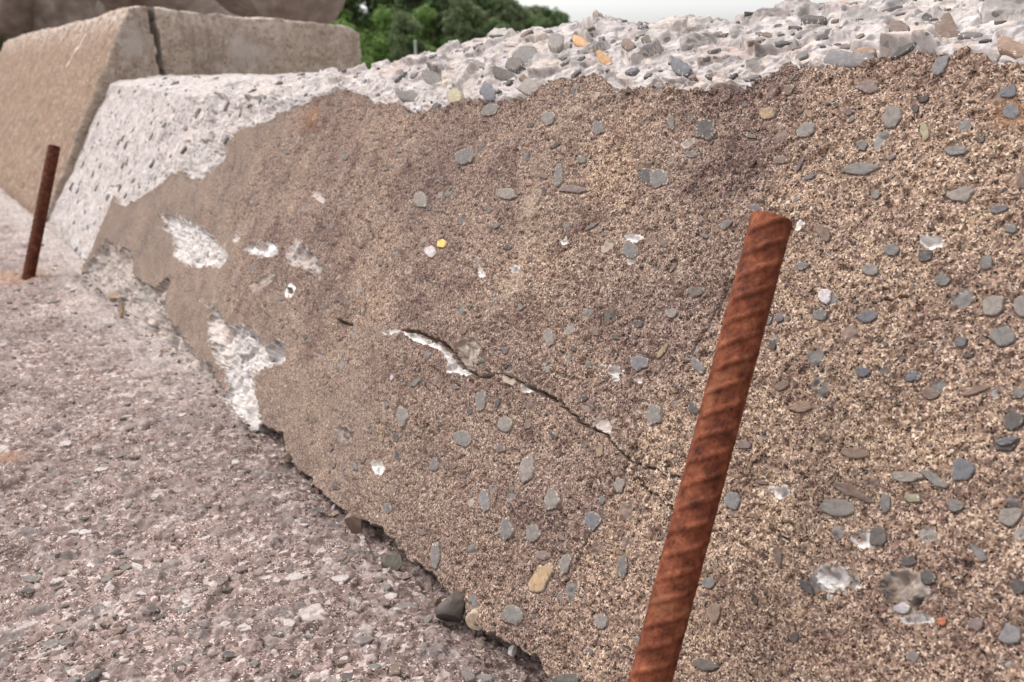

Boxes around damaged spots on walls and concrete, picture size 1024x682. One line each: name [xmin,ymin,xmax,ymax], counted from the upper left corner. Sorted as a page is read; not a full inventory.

spalling [21,0,1024,433]
crack [336,317,353,326]
crack [380,328,682,511]